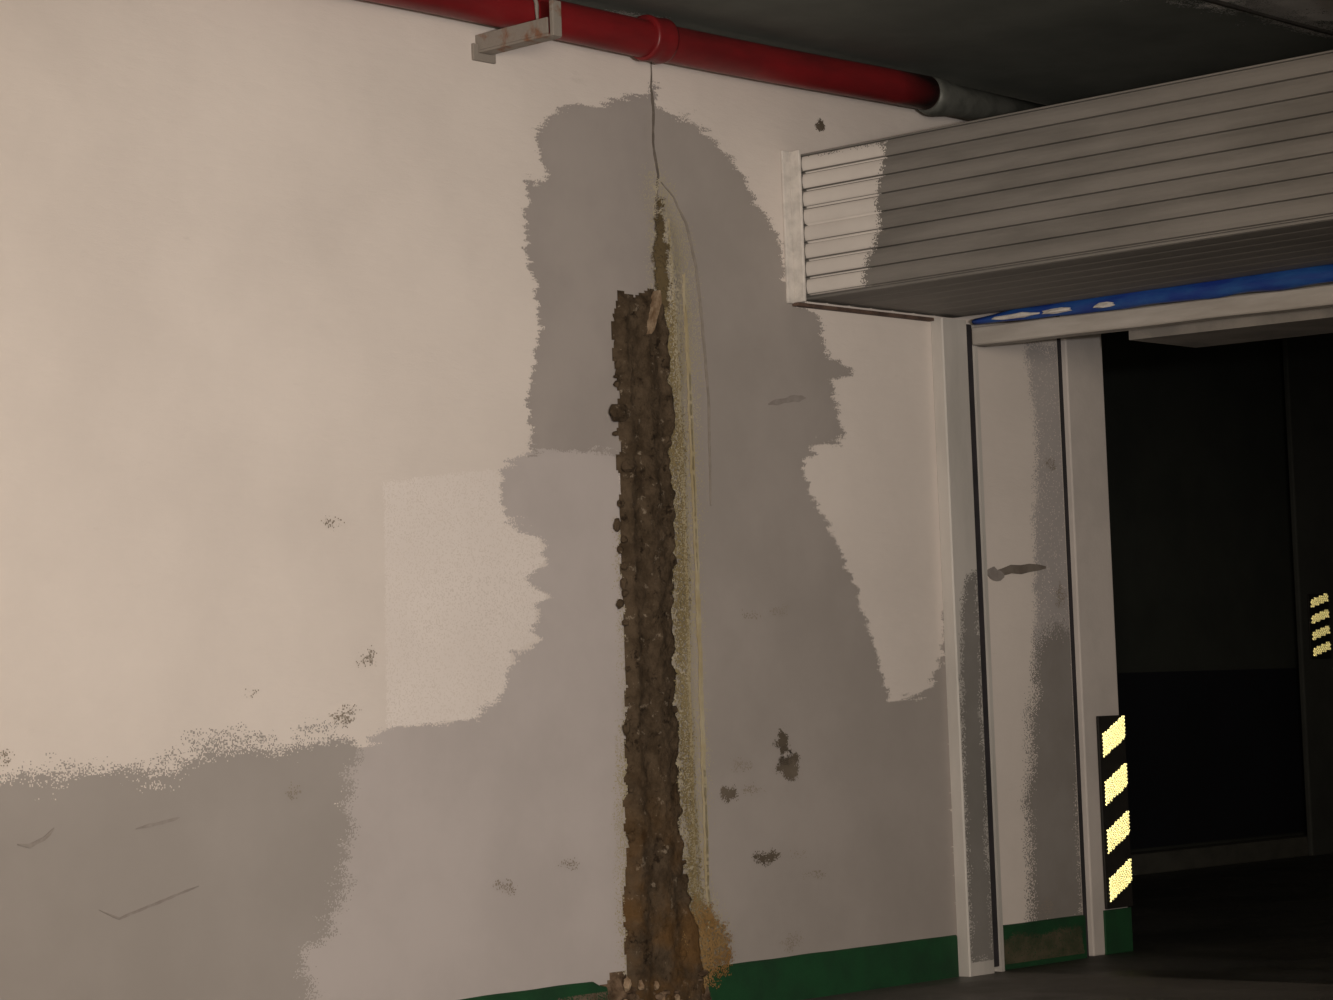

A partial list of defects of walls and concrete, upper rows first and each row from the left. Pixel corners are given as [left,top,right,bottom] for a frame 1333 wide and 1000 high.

crack [650,62,712,506]
damp [0,81,994,1000]
peeling [772,729,800,782]